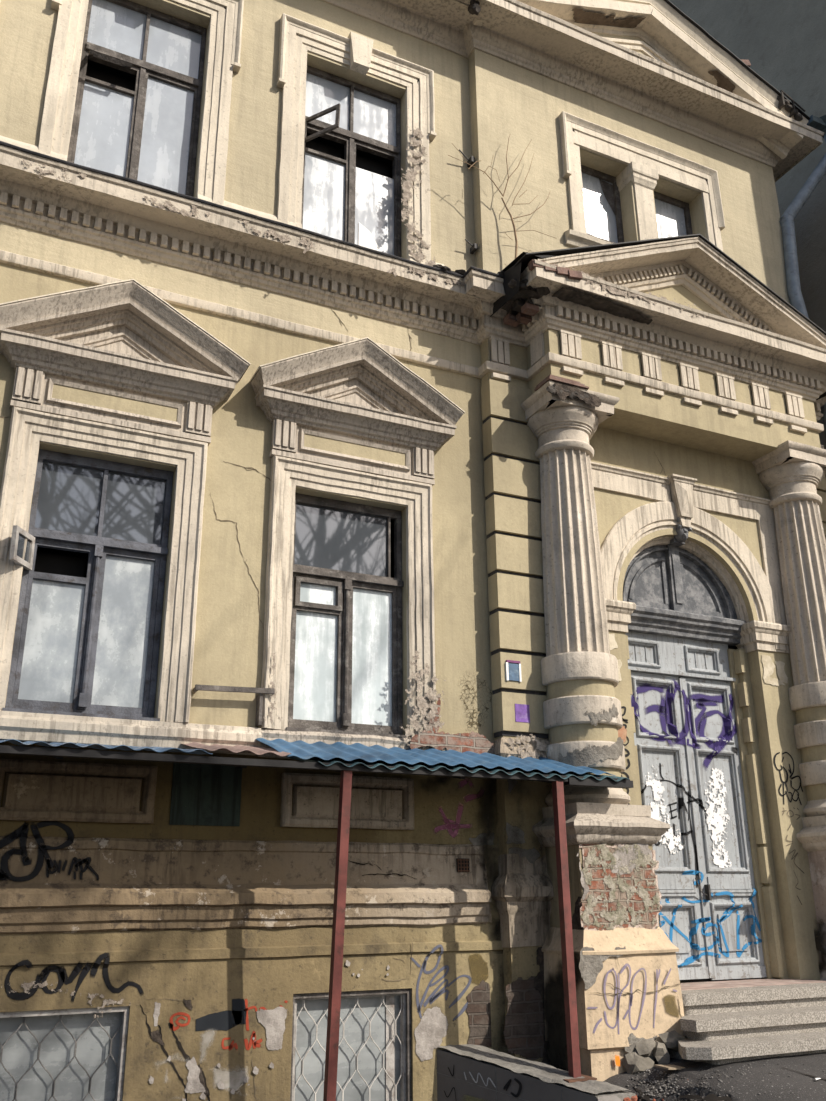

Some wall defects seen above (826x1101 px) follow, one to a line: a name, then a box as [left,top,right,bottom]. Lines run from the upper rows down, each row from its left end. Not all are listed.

flaking render [571,8,646,28]
flaking render [708,71,736,93]
flaking render [388,126,466,286]
crack [210,495,263,624]
flaking render [401,651,494,754]
flaking render [507,704,627,772]
flaking render [572,843,662,931]
flaking render [1,981,131,1018]
flaking render [151,1002,171,1062]
crack [140,996,210,1101]
flaking render [182,1007,288,1101]
flaking render [466,947,549,1063]